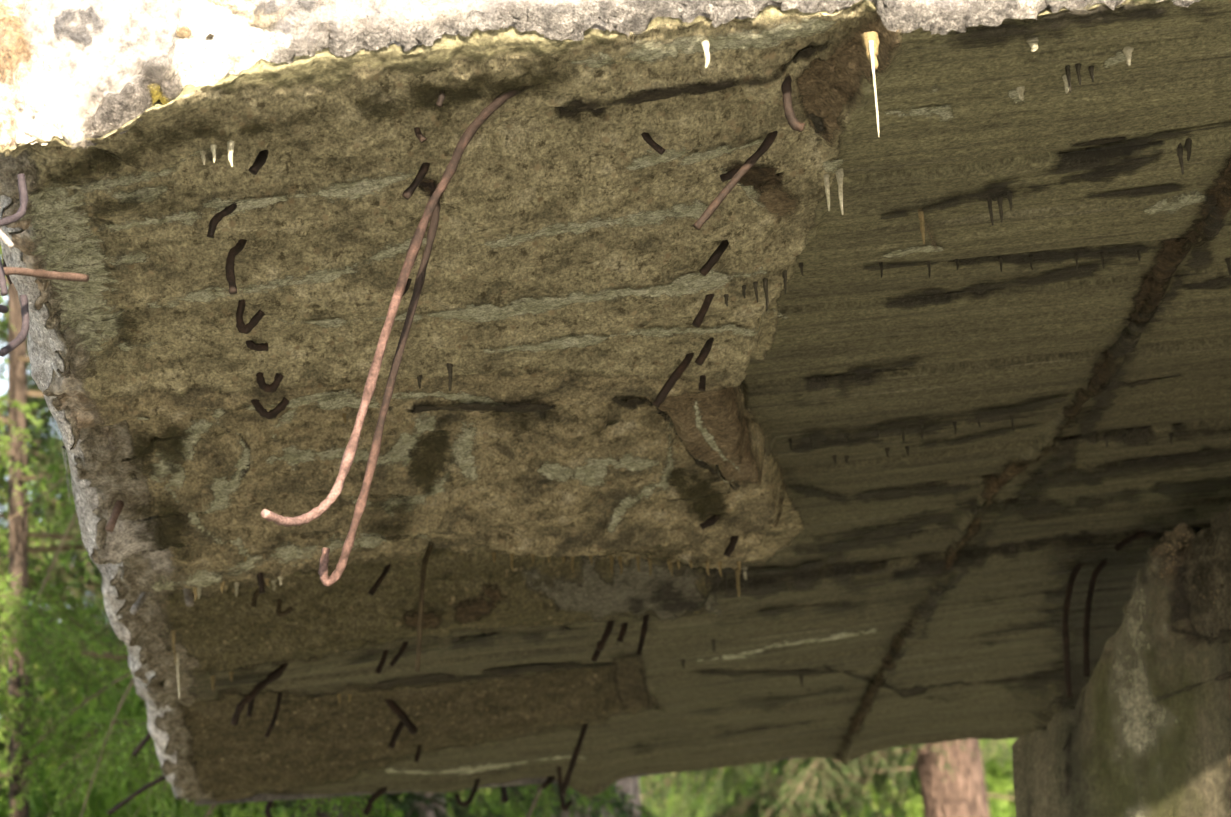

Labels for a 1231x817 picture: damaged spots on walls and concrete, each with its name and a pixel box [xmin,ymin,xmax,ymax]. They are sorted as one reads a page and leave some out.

crack [558,45,828,119]
crack [1072,137,1125,147]
spalling [0,0,1120,673]
crack [1094,375,1181,390]
spalling [9,275,663,803]
spalling [1149,504,1231,643]
crack [696,665,1089,751]